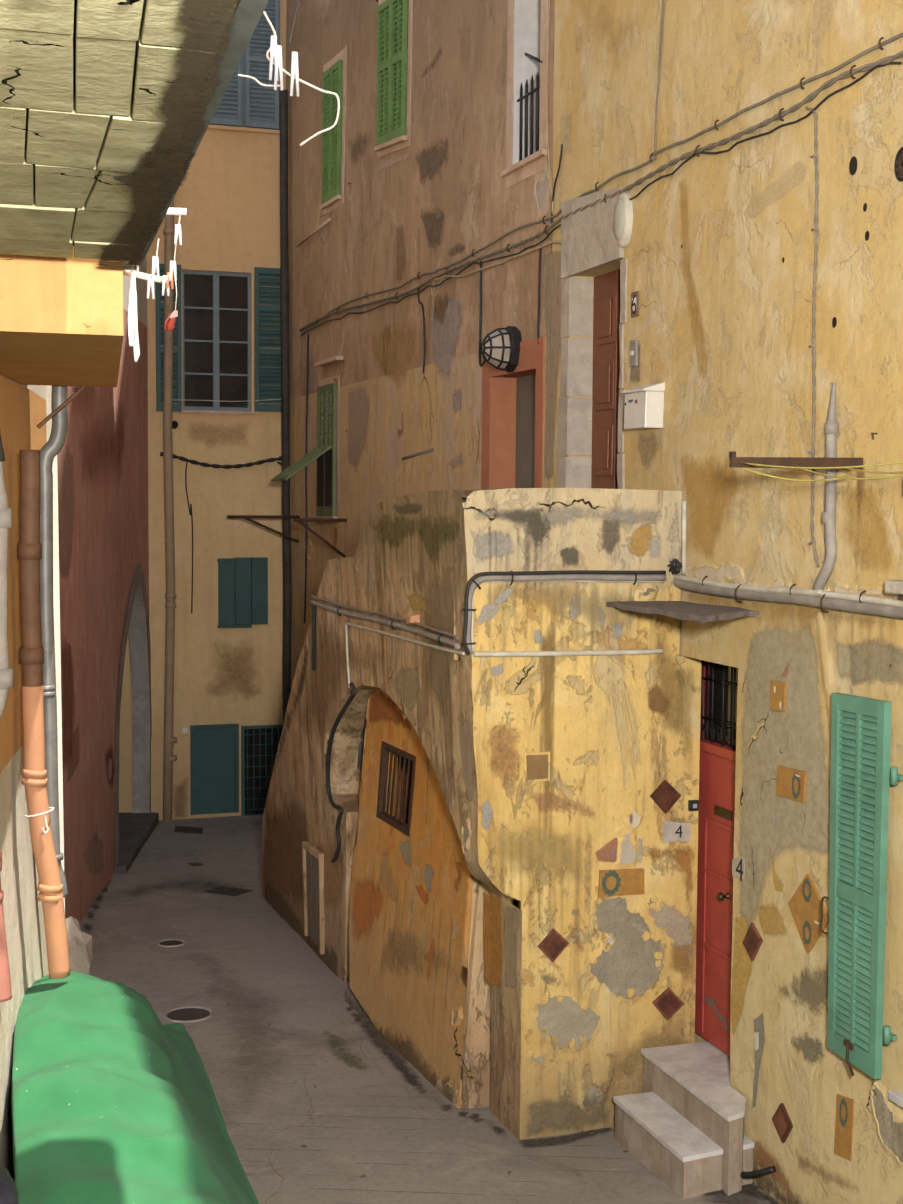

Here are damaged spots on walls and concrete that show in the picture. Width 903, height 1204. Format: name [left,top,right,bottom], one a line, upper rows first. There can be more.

crack [1,40,73,138]
water stain [97,0,240,270]
crack [539,494,606,512]
peeling [837,640,903,684]
peeling [731,628,830,1108]
flaking render [530,893,692,1054]